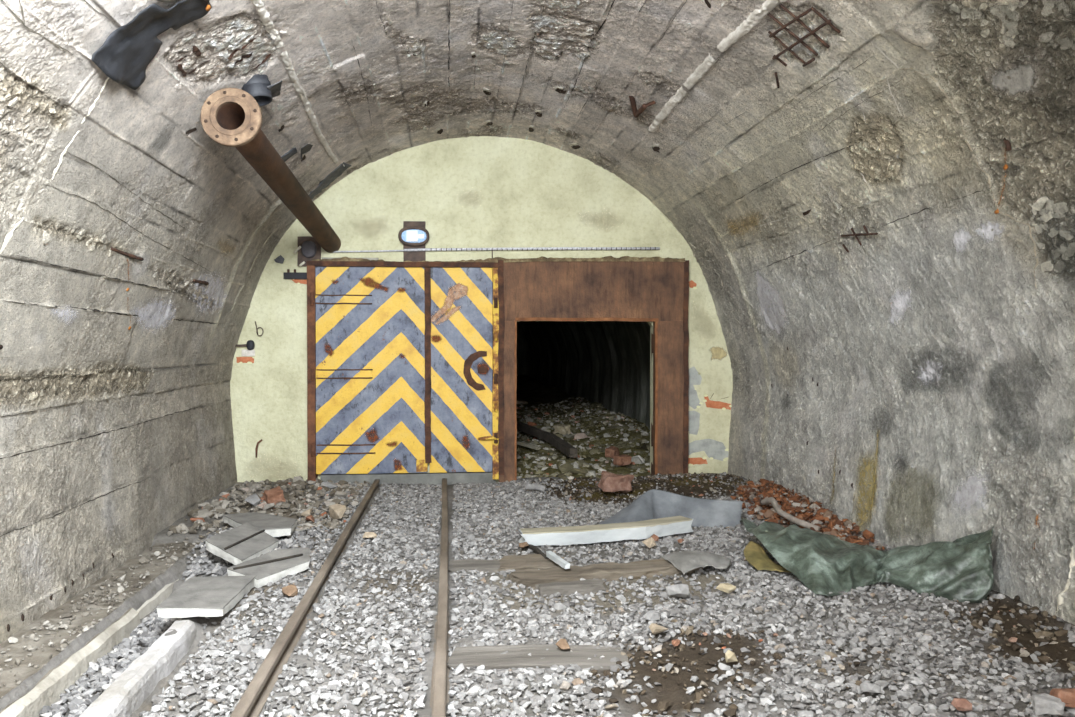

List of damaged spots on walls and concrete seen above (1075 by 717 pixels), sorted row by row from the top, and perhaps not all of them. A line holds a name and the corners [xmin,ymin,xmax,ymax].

spalling [165,14,288,89]
spalling [755,4,846,89]
spalling [949,0,1070,48]
spalling [1039,31,1075,50]
spalling [8,86,56,116]
spalling [849,112,908,180]
spalling [899,67,1075,294]
crack [0,478,147,537]